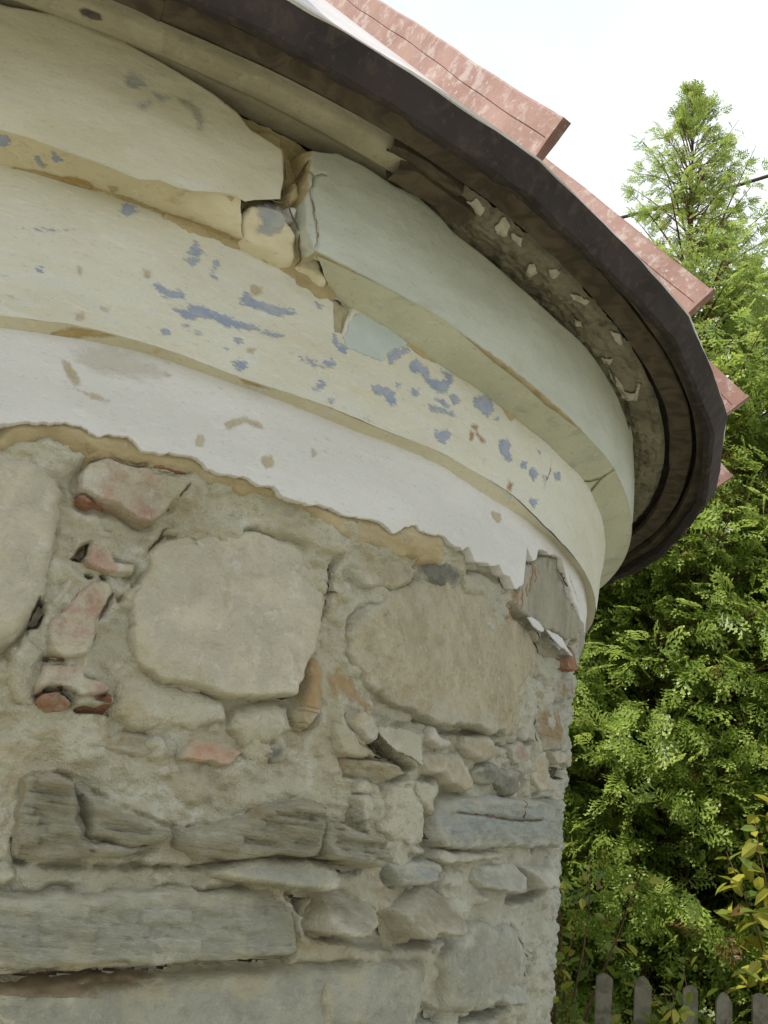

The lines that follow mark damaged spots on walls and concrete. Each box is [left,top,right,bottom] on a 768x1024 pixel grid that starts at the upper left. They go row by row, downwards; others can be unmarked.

peeling [154,282,285,371]
peeling [239,292,297,317]
crack [241,160,324,267]
flaking render [299,301,356,416]
peeling [371,343,515,422]
peeling [466,198,485,216]
peeling [495,217,522,247]
peeling [526,264,560,279]
peeling [569,293,589,305]
flaking render [0,424,445,567]
peeling [499,440,561,483]
peeling [507,555,579,659]